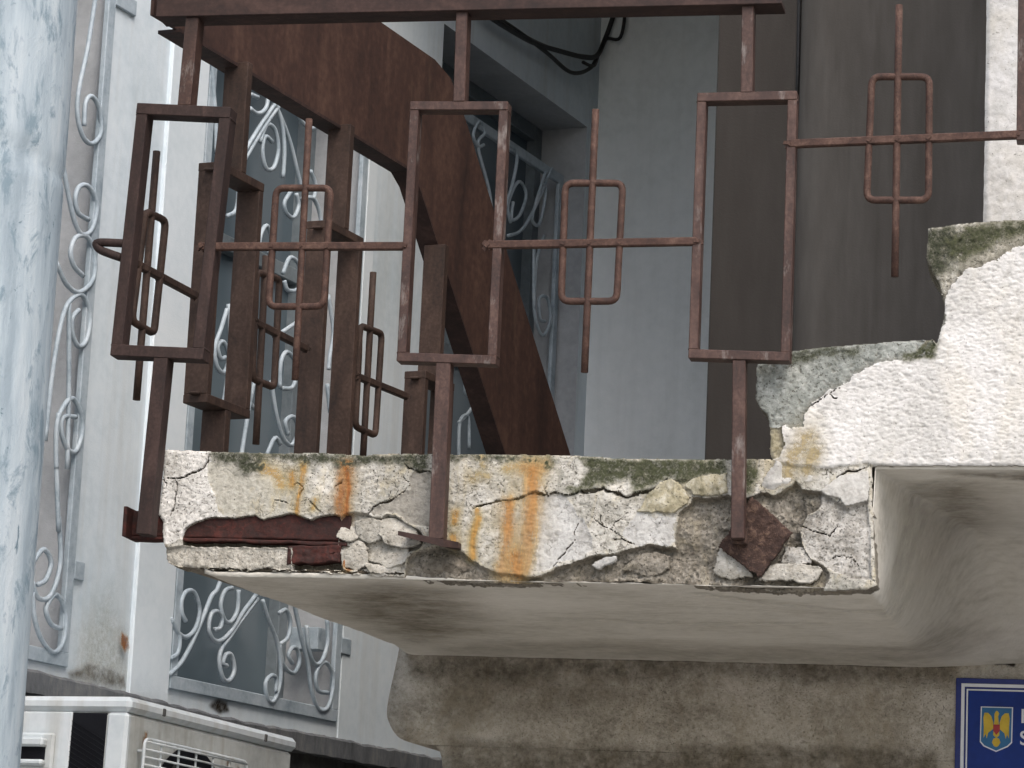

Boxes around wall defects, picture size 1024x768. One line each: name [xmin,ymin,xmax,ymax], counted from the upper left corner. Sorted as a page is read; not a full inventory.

peeling [927,220,1024,328]
crack [163,456,210,515]
rust [260,462,319,517]
rust [335,461,353,519]
rust [495,460,547,584]
spalling [166,340,933,594]
crack [473,477,668,566]